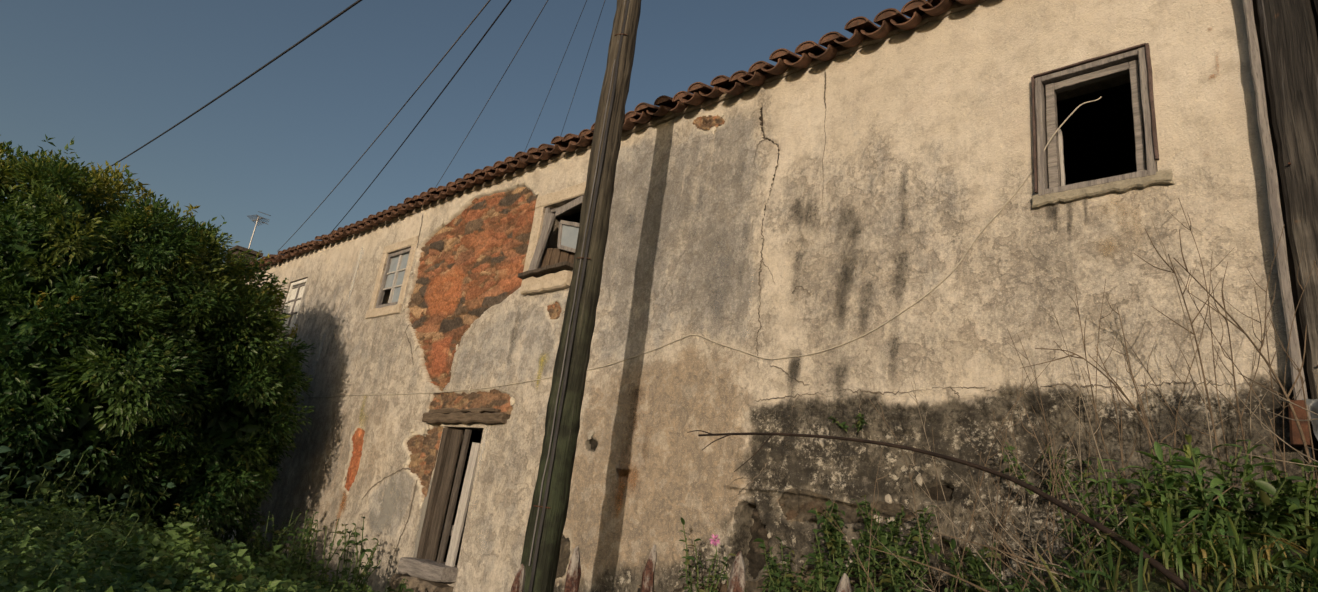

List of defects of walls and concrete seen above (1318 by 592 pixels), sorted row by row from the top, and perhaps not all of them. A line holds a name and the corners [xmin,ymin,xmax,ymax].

flaking render [693,114,726,135]
crack [754,107,1282,437]
flaking render [547,301,565,319]
flaking render [402,179,539,509]
hole [915,473,954,501]